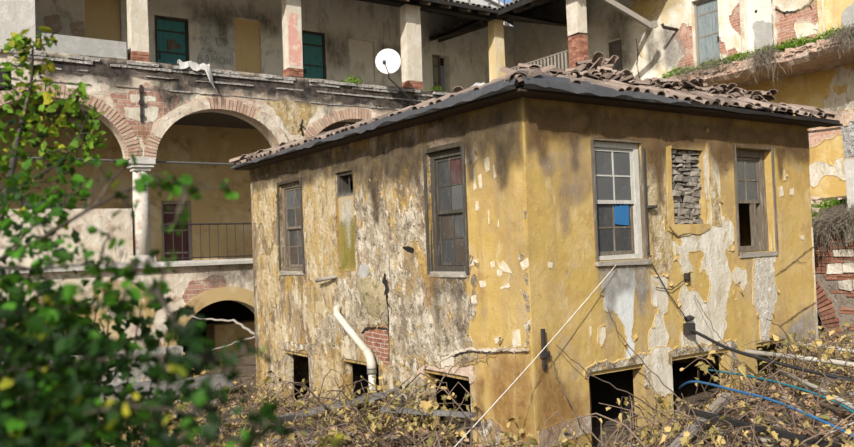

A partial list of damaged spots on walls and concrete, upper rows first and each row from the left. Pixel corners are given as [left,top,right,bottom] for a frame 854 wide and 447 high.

flaking render [71,62,180,145]
flaking render [193,8,396,136]
flaking render [673,22,694,71]
flaking render [775,0,822,46]
flaking render [808,65,854,148]
water stain [249,101,810,221]
flaking render [809,153,846,188]
water stain [340,199,355,269]
flaking render [251,162,486,408]
flaking render [490,253,531,348]
flaking render [583,122,780,401]